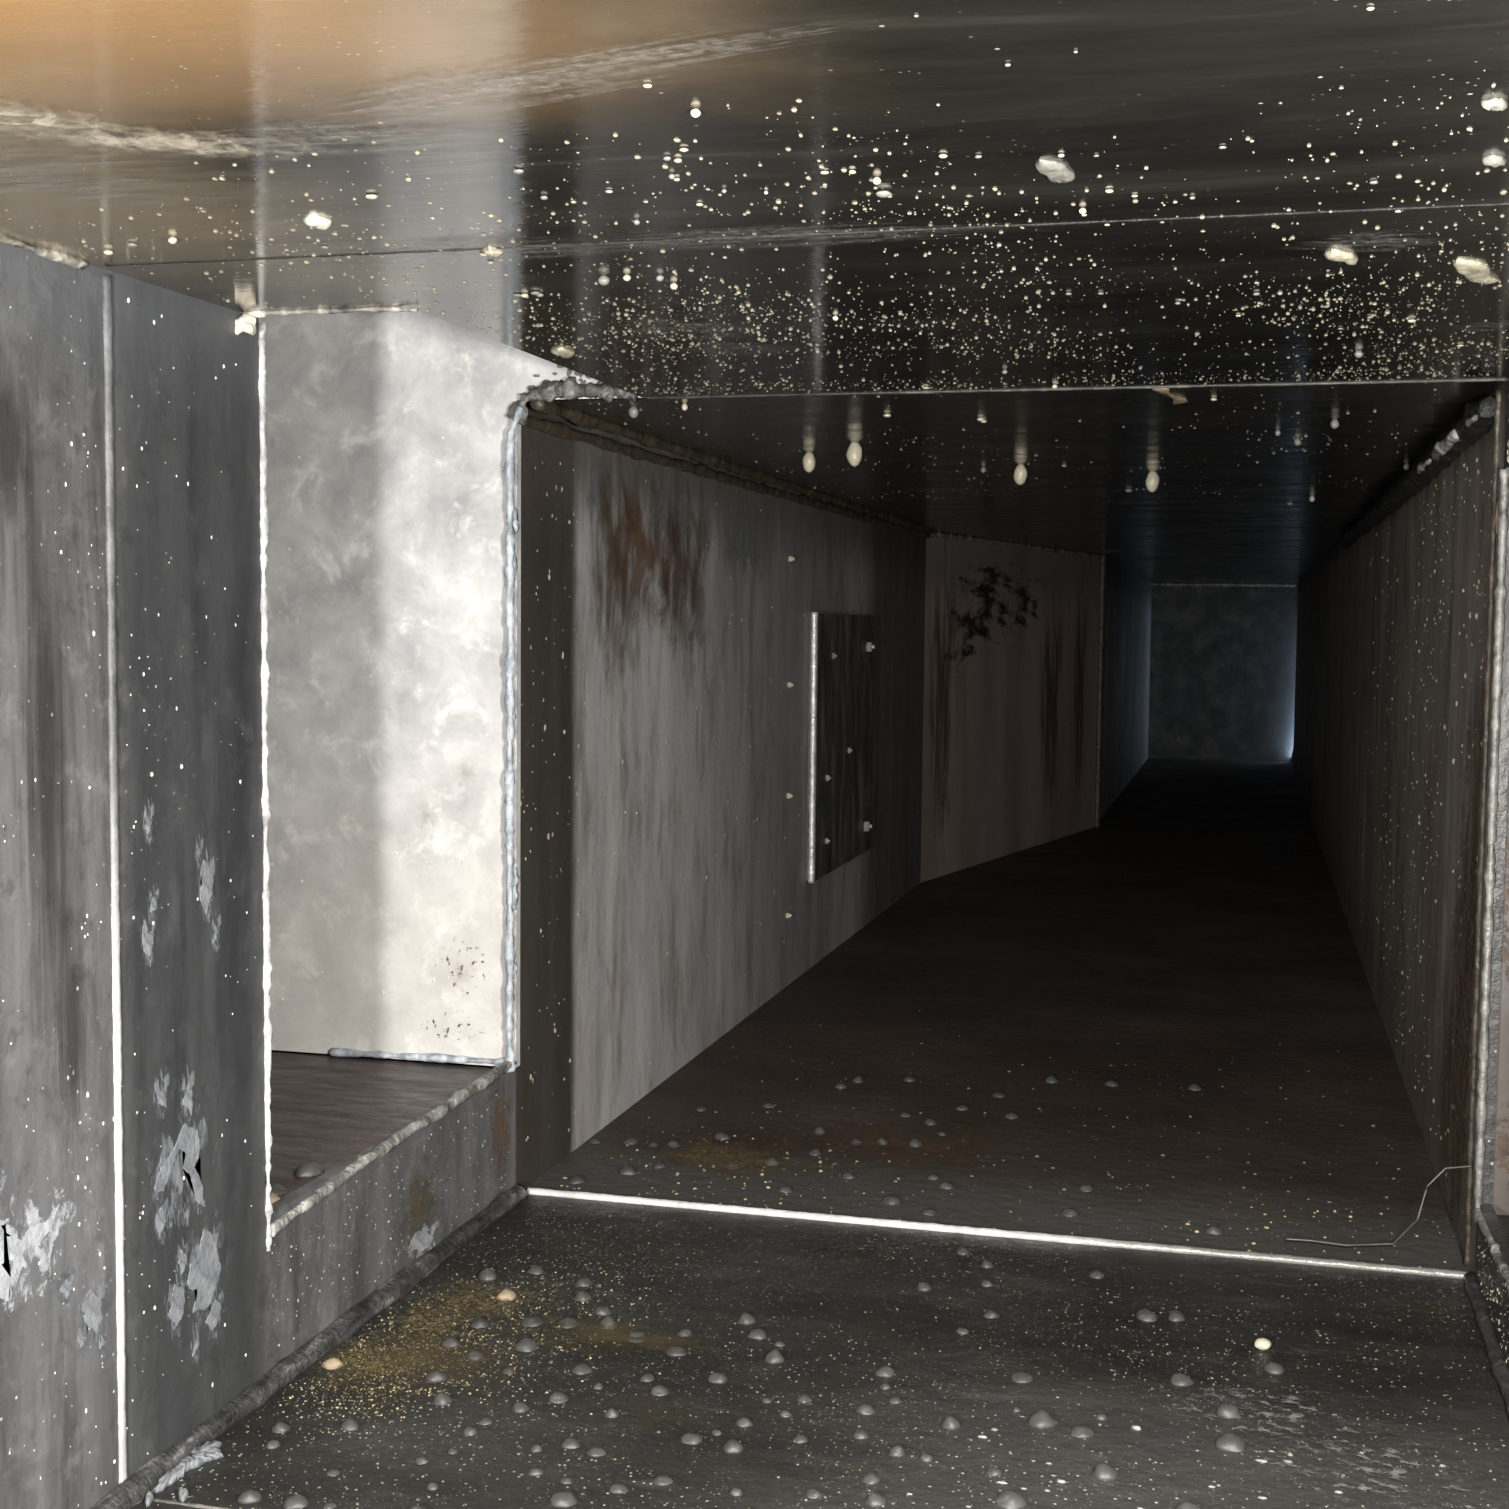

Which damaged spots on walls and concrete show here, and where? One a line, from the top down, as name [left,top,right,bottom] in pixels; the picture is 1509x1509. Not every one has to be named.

rust [1501,791,1509,981]
peeling [0,1170,109,1360]
peeling [148,1064,228,1363]